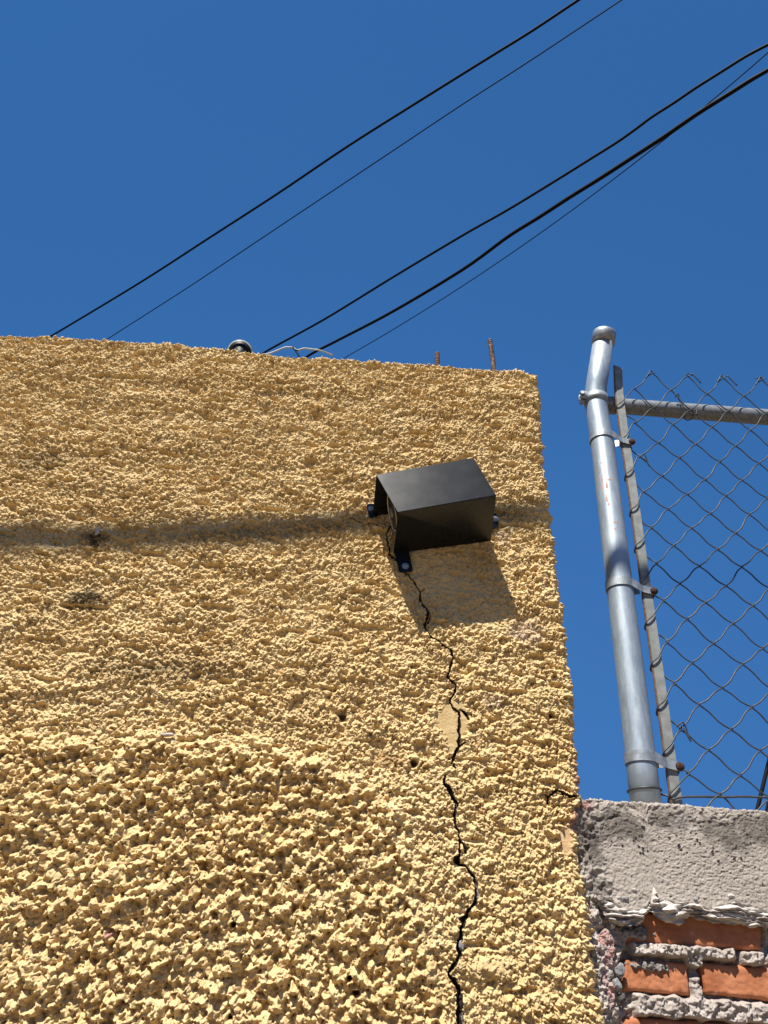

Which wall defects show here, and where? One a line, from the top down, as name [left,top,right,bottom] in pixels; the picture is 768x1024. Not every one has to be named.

crack [349,517,480,1024]
crack [545,790,578,804]